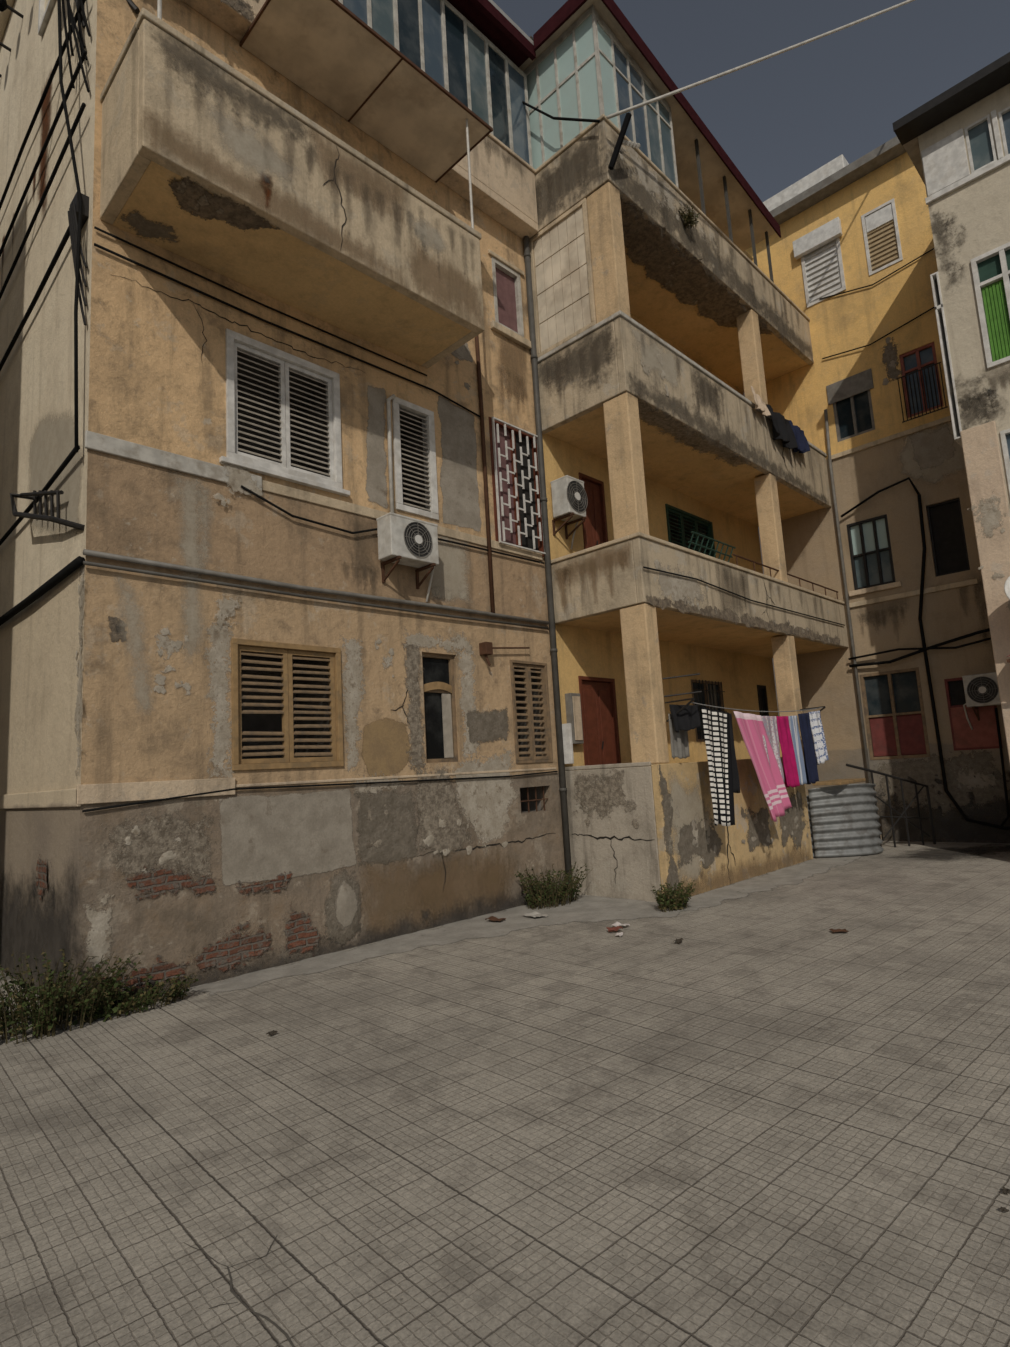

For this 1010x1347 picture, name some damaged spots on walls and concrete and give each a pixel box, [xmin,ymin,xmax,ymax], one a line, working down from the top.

spalling [167,176,280,230]
crack [323,146,347,247]
leakage [413,250,480,316]
spalling [615,146,772,335]
leakage [931,214,962,283]
leakage [539,325,612,386]
leakage [632,371,827,502]
crack [417,833,655,890]
peeling [659,764,723,891]
spalling [741,791,809,852]
flaking render [83,894,322,1002]
crack [185,1236,295,1347]